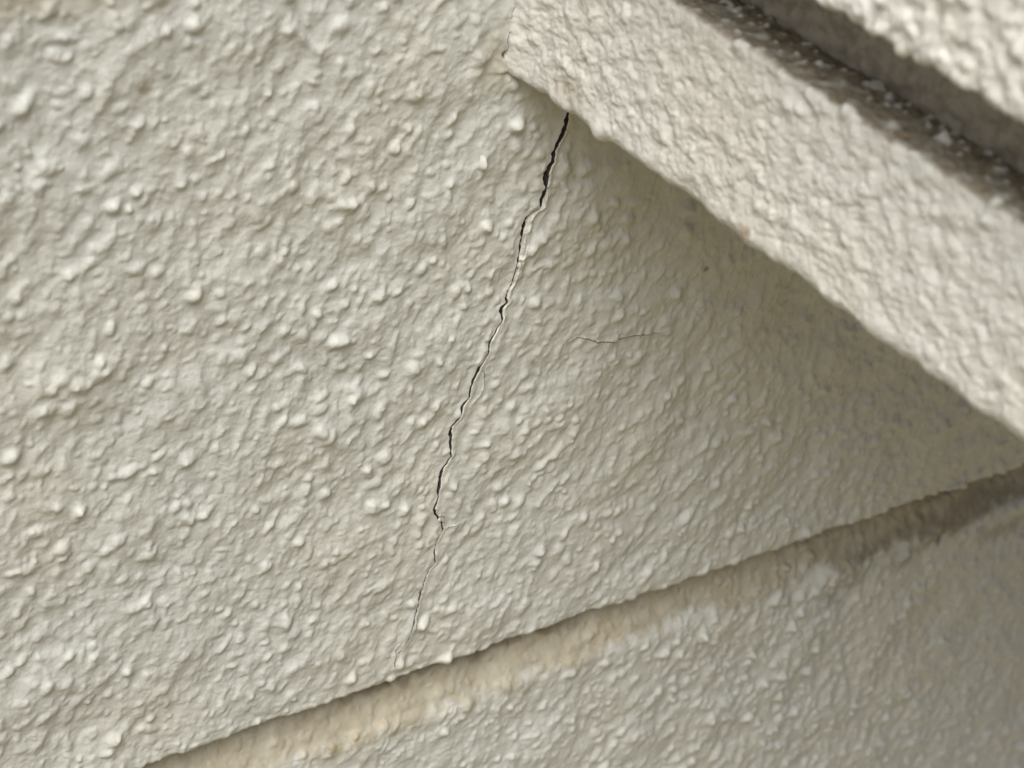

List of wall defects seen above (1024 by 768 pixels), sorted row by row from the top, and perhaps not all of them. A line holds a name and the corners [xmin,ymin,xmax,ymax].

crack [393,112,570,668]